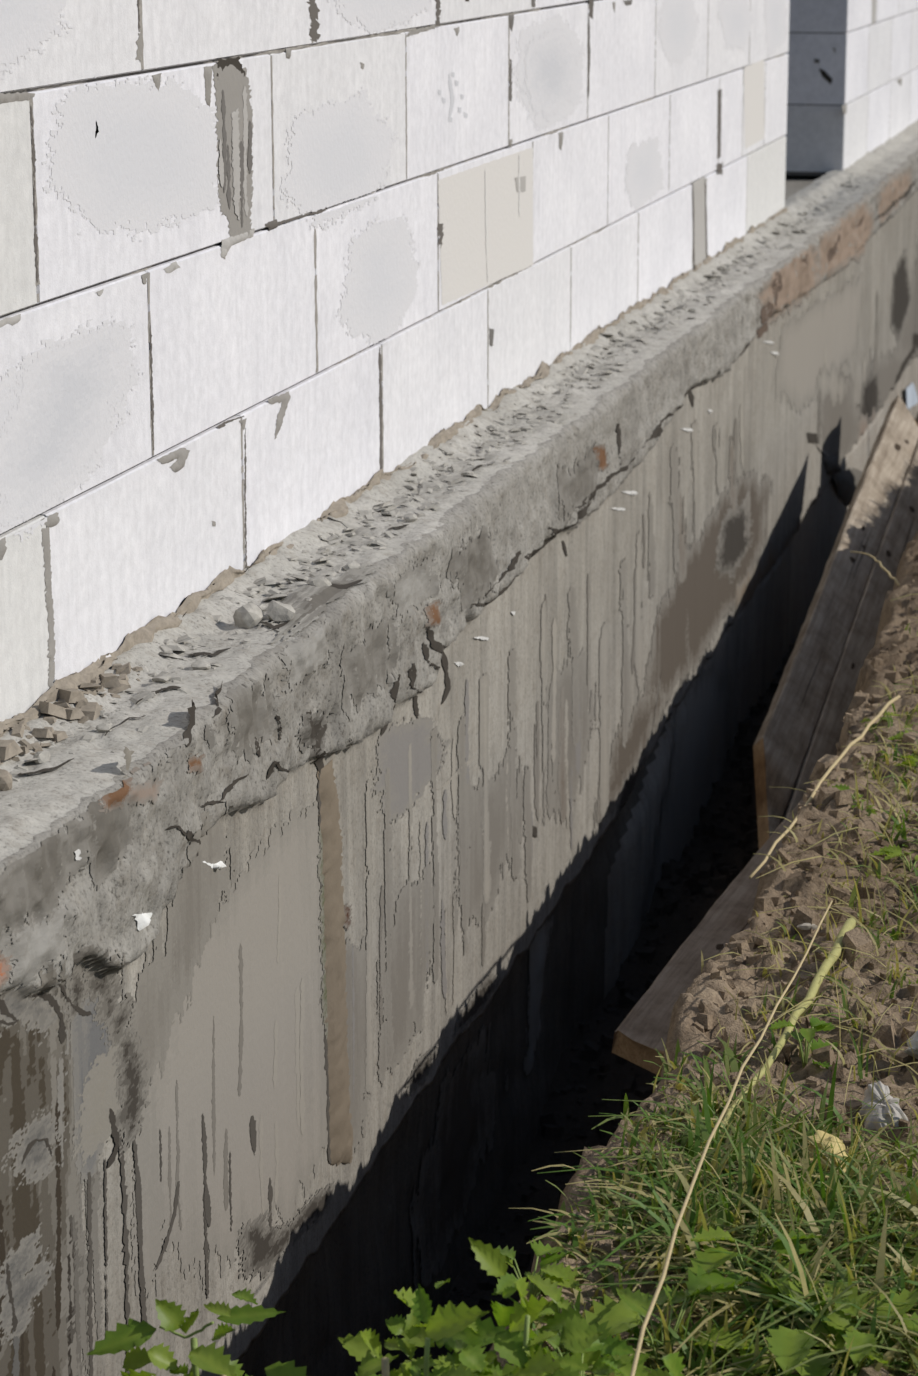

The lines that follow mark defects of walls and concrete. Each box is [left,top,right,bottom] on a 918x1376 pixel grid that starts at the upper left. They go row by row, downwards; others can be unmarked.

water stain [0,315,145,542]
crack [473,332,757,606]
water stain [775,244,918,464]
crack [18,758,74,775]
crack [105,648,230,747]
crack [259,621,289,629]
crack [165,627,451,856]
water stain [345,404,754,1152]
water stain [0,801,330,1376]
crack [323,1024,331,1164]